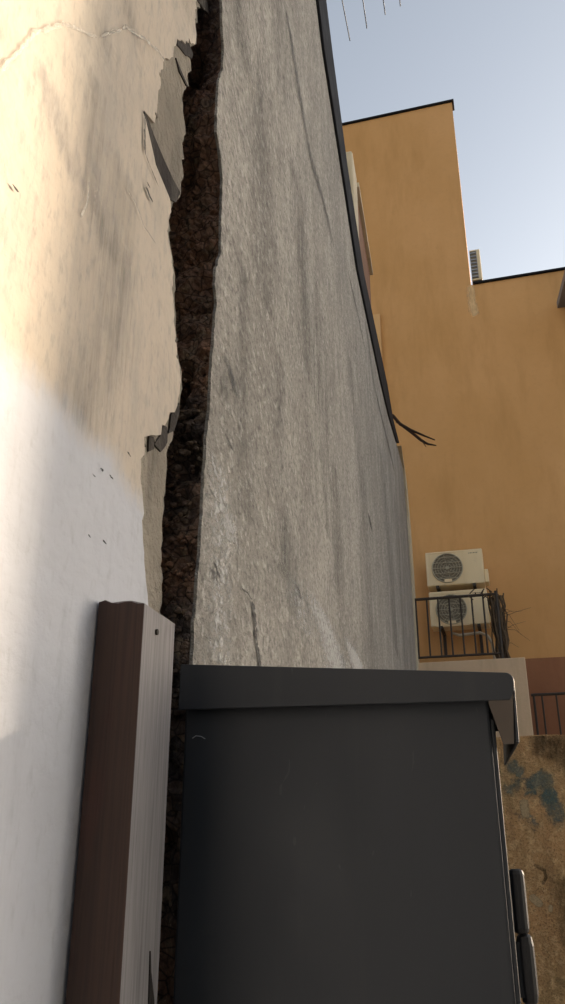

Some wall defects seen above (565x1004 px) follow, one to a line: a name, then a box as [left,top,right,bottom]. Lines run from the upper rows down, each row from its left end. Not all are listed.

crack [2,0,221,1004]
crack [242,588,261,666]